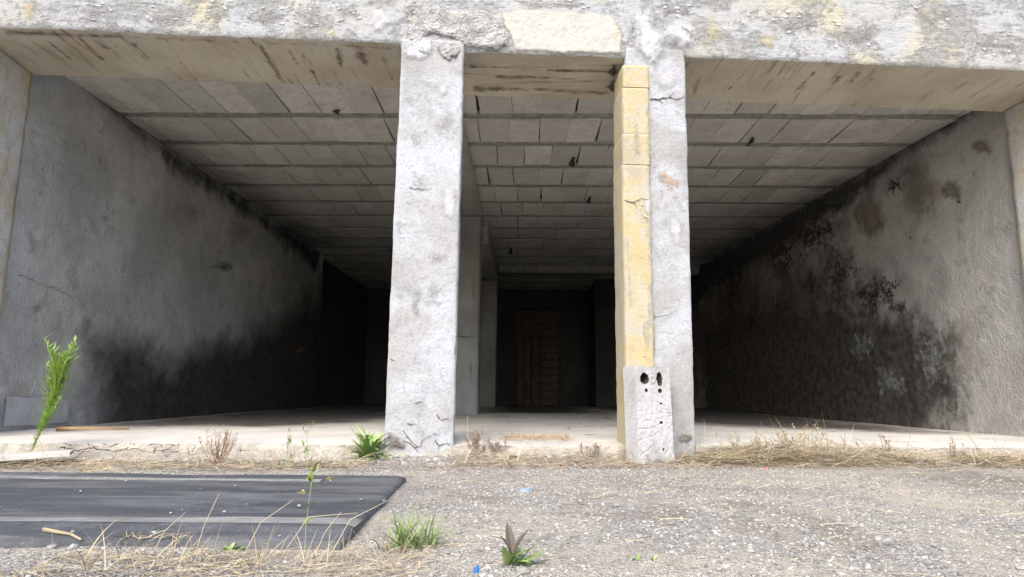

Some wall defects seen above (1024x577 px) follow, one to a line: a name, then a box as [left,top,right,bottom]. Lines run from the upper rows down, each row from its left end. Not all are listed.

spalling [405,1,508,50]
leakage [475,67,573,91]
rust [654,173,680,199]
leakage [943,183,961,203]
leakage [691,207,906,396]
crack [403,401,448,452]
crack [60,443,194,457]